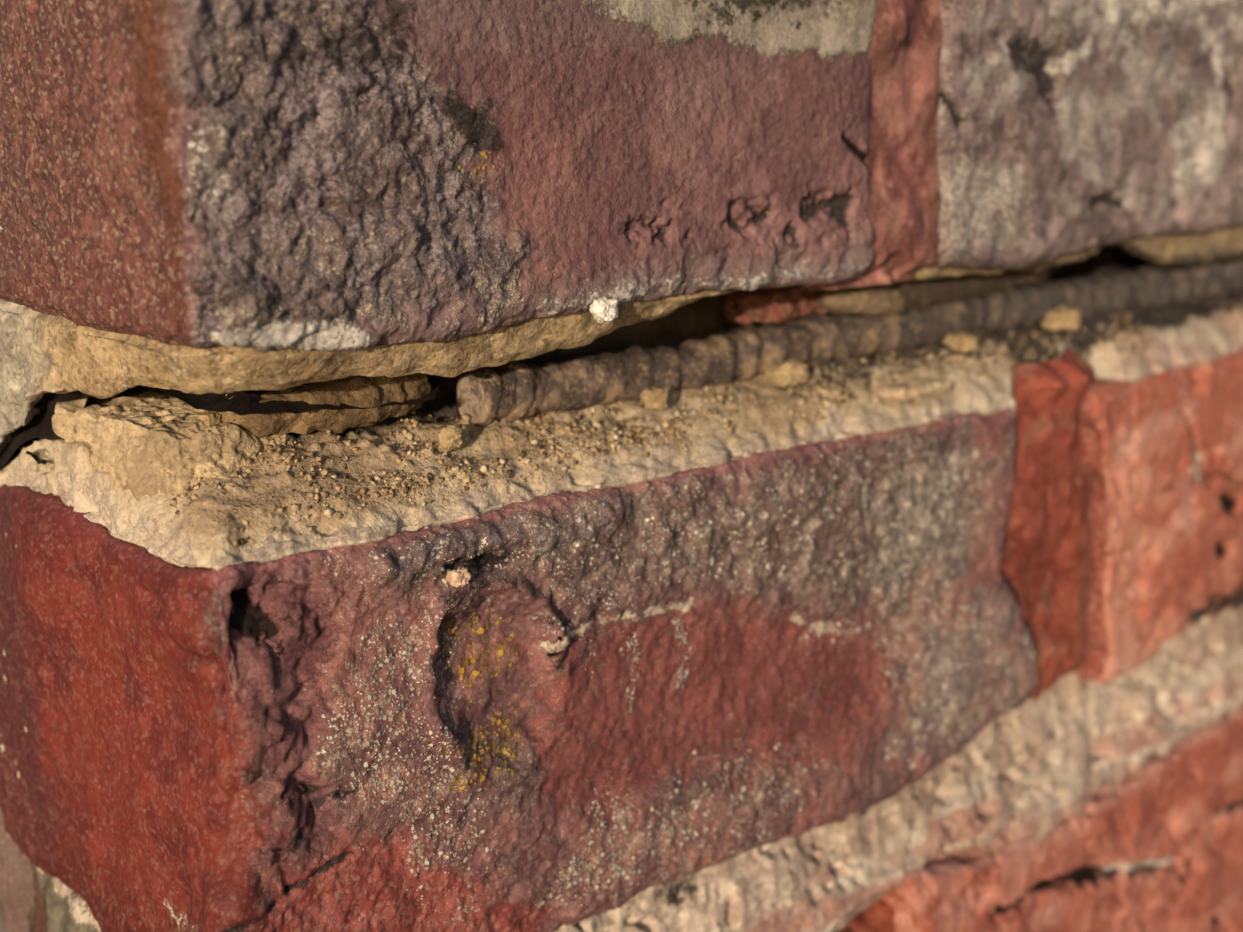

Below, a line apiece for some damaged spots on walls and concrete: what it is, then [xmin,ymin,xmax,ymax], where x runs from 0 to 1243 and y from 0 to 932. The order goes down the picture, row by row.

spalling [819,268,1051,316]
spalling [1041,306,1081,331]
spalling [943,332,979,353]
spalling [764,359,810,389]
spalling [640,386,673,410]
peeling [877,377,953,401]
crack [0,374,443,469]
spalling [257,433,299,450]
spalling [435,424,470,452]
spalling [27,447,58,475]
crack [224,784,359,932]
crack [991,845,1193,918]